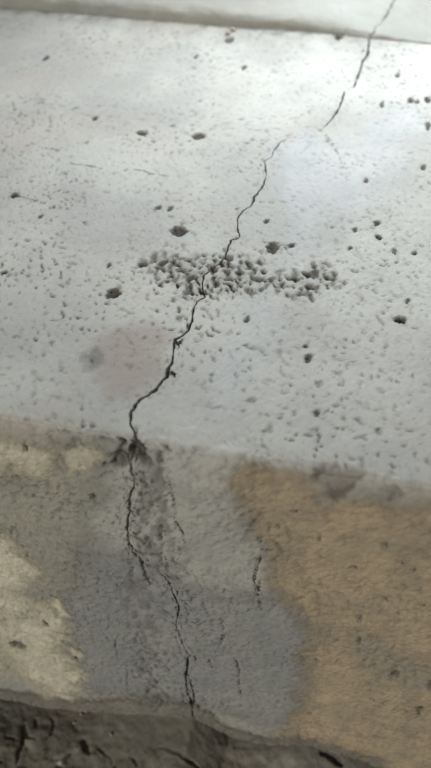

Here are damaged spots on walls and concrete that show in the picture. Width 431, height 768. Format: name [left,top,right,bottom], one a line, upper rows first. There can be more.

crack [320,0,395,167]
crack [130,141,283,438]
crack [127,477,185,592]
crack [253,537,263,610]
crack [186,655,213,706]